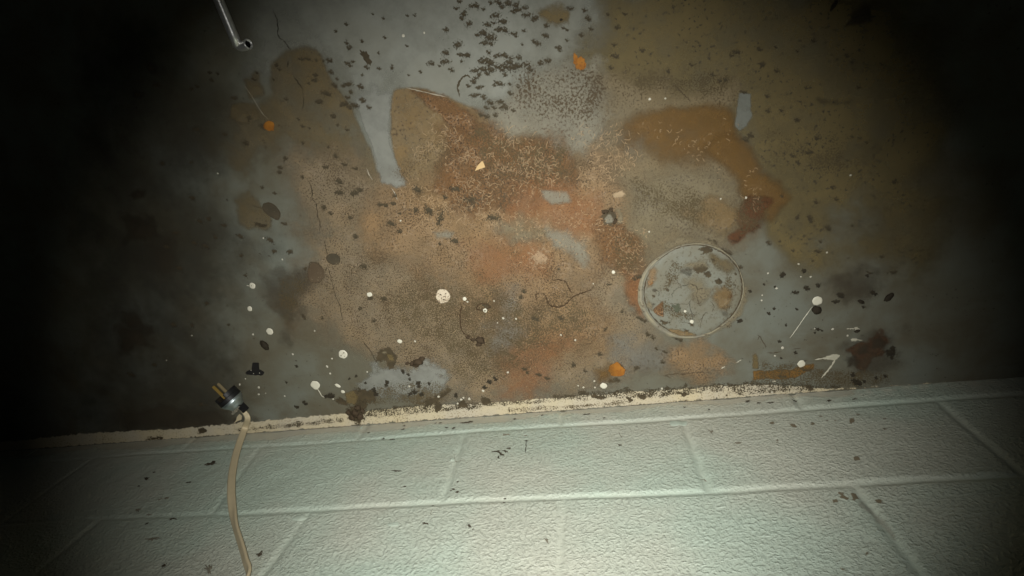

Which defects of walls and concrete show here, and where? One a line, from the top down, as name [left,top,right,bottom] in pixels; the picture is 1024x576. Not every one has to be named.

corrosion [413,90,577,214]
damp [231,0,948,405]
corrosion [625,106,788,243]
corrosion [595,223,655,311]
corrosion [599,362,625,383]
corrosion [846,331,888,370]